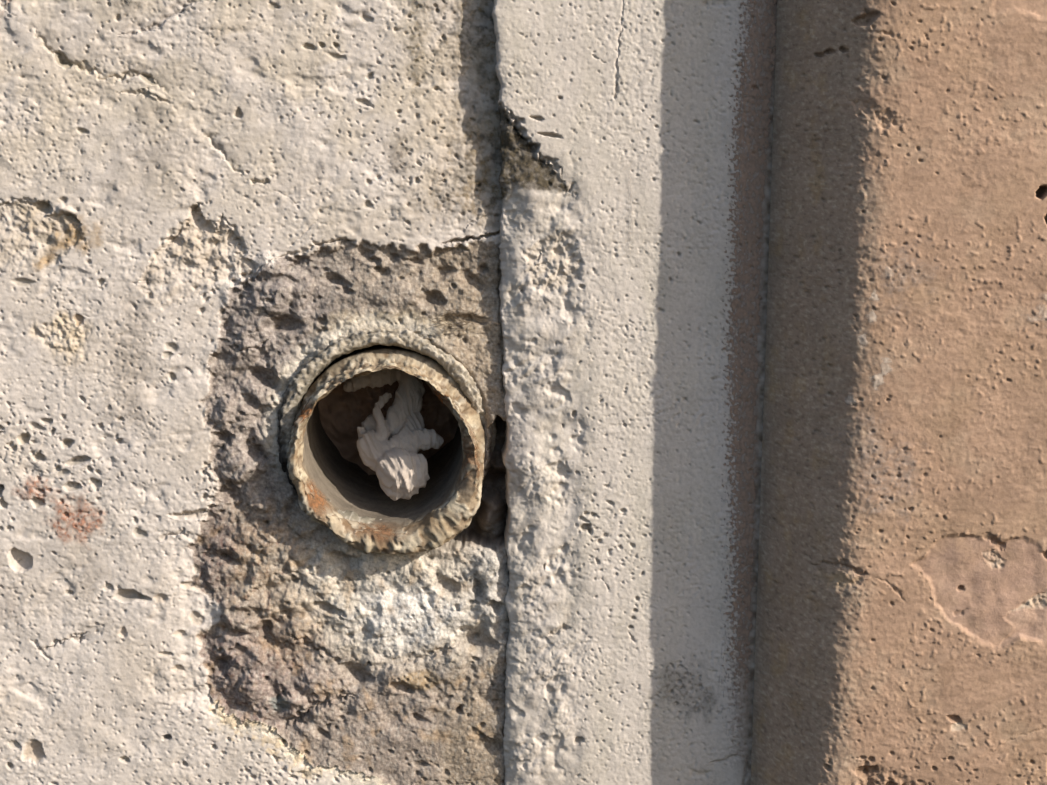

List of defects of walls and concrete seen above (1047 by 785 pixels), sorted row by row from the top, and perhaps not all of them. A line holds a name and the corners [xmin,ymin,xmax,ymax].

crack [0,0,174,101]
crack [117,0,213,36]
spalling [498,102,572,199]
spalling [446,414,508,554]
peeling [909,532,1047,653]
spalling [209,696,389,785]